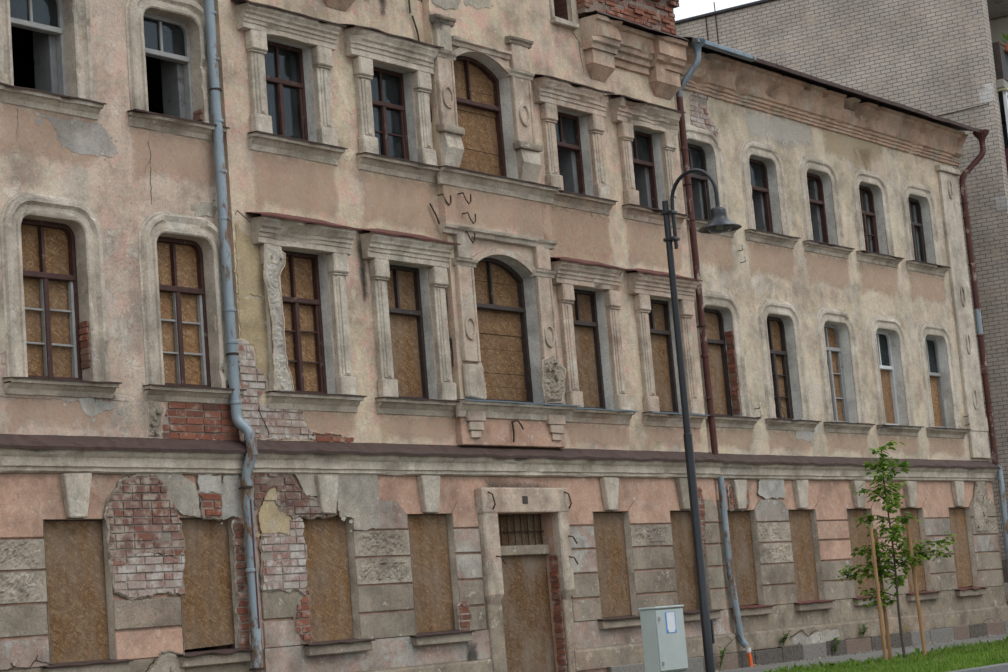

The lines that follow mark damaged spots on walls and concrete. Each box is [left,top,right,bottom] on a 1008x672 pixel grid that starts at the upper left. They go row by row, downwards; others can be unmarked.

flaking render [145,223,355,443]
flaking render [725,331,741,415]
flaking render [147,650,187,672]
flaking render [104,473,381,649]
corrosion [250,499,260,628]
flaking render [456,598,472,631]
flaking render [549,554,567,672]
flaking render [697,487,706,563]